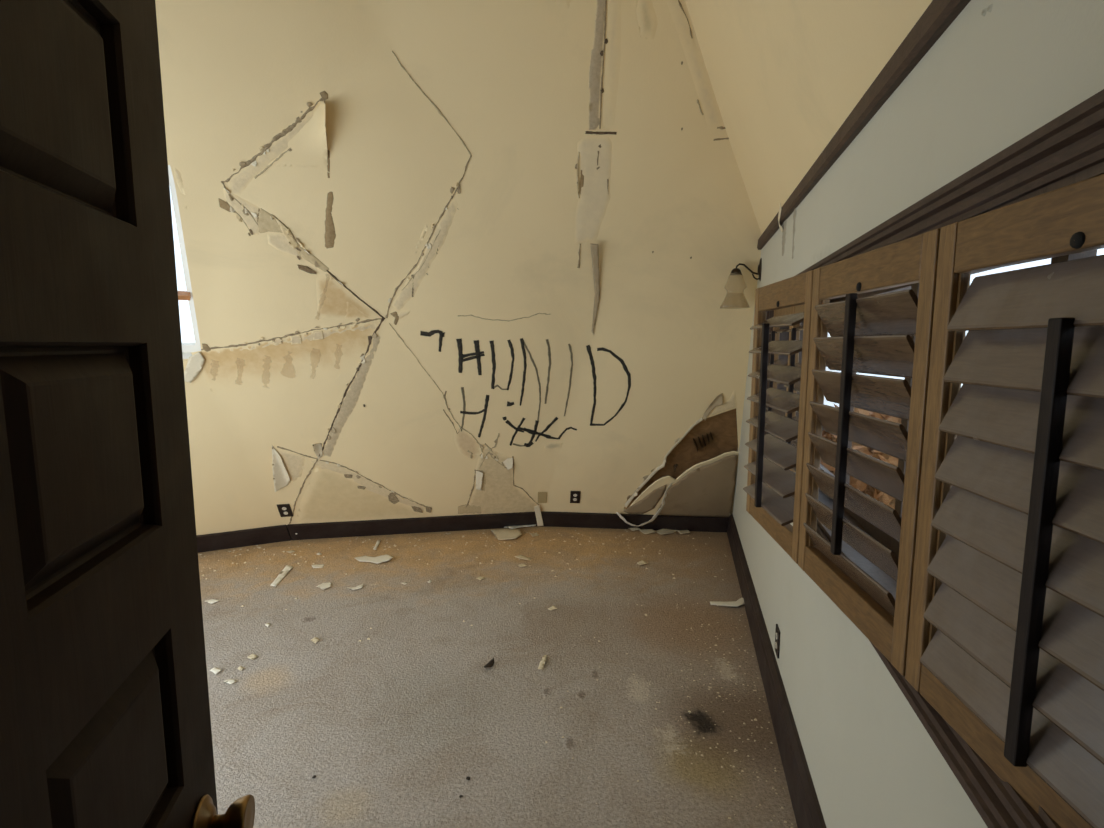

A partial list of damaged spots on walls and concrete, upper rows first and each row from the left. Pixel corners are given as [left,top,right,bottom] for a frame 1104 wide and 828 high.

peeling [219,187,257,236]
peeling [270,216,320,274]
peeling [325,192,336,248]
crack [201,51,483,525]
crack [458,313,550,322]
peeling [575,136,612,268]
spalling [458,433,544,537]
spalling [615,390,738,534]